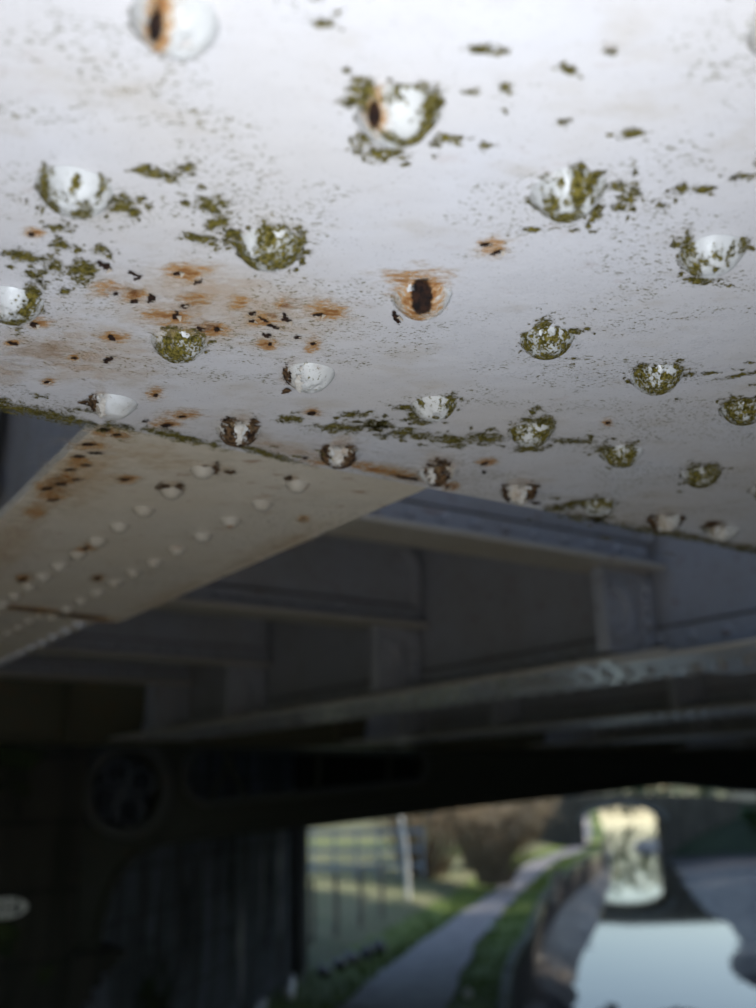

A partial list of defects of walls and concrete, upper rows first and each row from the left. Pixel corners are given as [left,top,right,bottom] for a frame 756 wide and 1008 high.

corrosion [144,0,172,53]
corrosion [364,87,386,131]
corrosion [98,331,130,343]
corrosion [94,262,231,336]
corrosion [231,297,293,350]
corrosion [305,300,348,321]
corrosion [385,269,445,325]
corrosion [25,428,130,519]
corrosion [115,475,141,484]
corrosion [351,461,421,482]